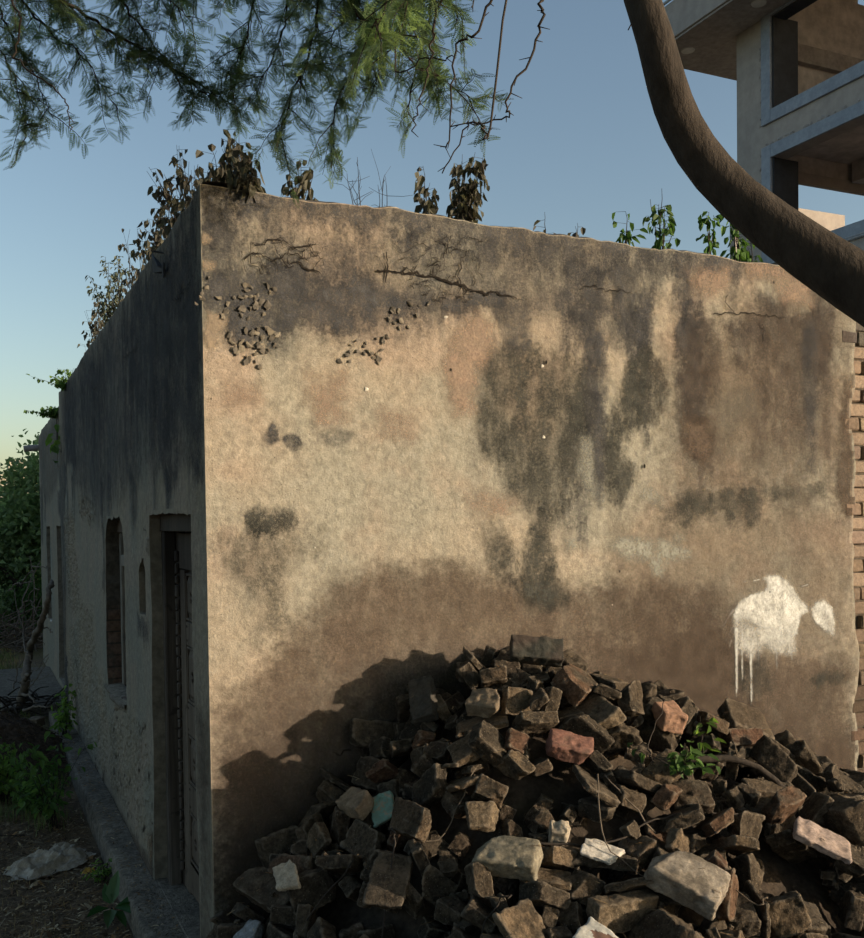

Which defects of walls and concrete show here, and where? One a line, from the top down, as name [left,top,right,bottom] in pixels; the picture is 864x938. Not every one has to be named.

crack [239,236,326,275]
crack [376,233,524,303]
peeling [195,262,281,370]
peeling [337,335,389,365]
damp [58,185,855,924]